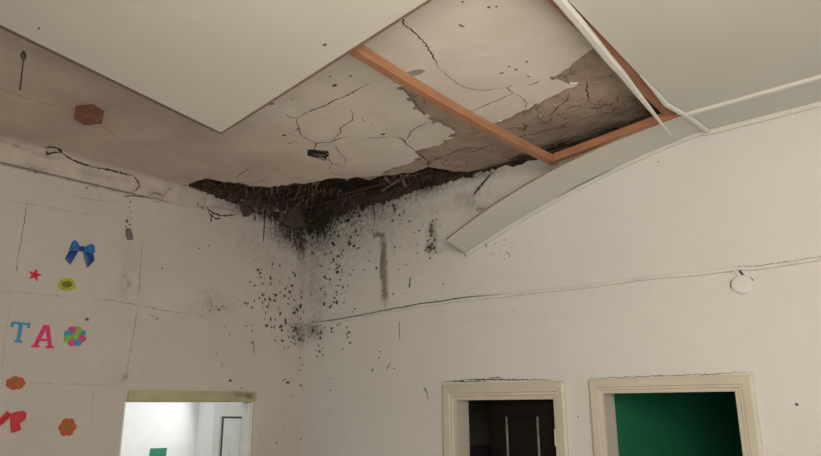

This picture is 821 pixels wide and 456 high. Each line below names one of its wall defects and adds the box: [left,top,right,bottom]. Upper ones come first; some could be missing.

crack [46,147,173,203]
crack [287,83,370,175]
flaking render [189,82,539,236]
crack [379,19,610,170]
flaking render [495,49,660,154]
leakage [244,205,476,371]